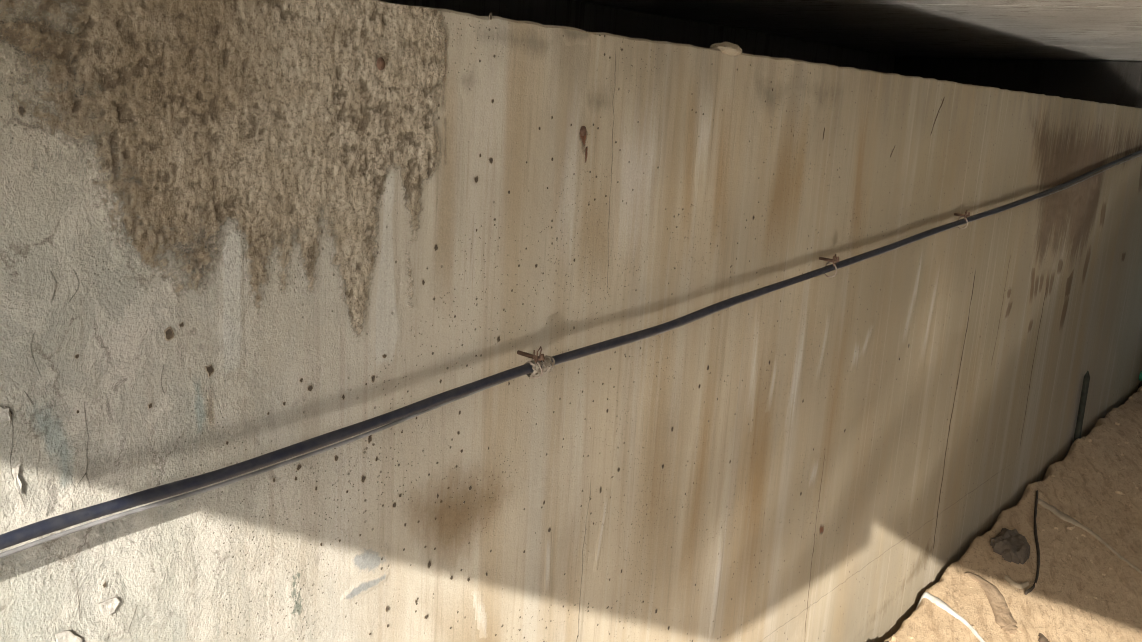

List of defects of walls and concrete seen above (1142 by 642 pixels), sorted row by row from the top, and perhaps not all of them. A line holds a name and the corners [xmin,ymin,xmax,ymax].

damp [218,226,245,381]
damp [1027,198,1108,338]
peeling [0,406,11,422]
peeling [12,464,23,494]
damp [381,436,526,642]
peeling [55,630,82,642]